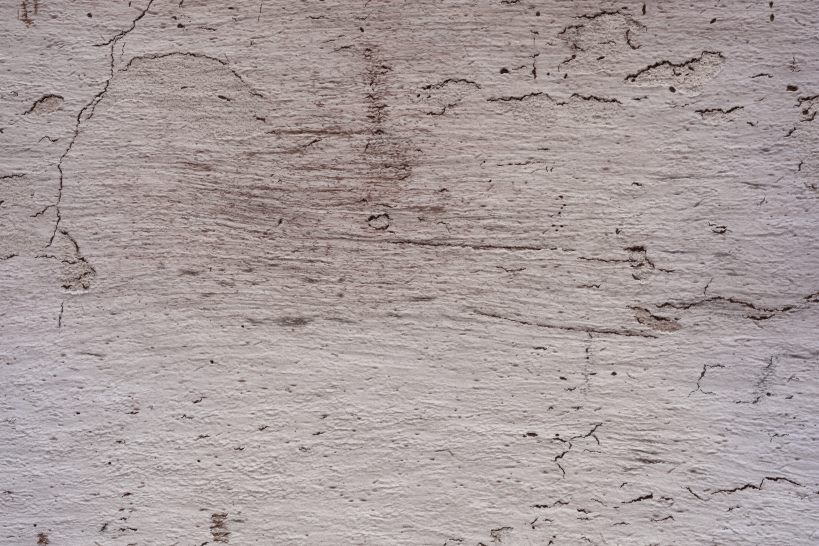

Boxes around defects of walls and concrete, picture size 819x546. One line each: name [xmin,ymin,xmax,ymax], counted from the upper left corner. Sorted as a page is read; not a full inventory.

spalling [22,94,65,118]
crack [30,0,159,248]
spalling [417,79,481,116]
spalling [487,51,758,127]
crack [652,280,819,321]
crack [625,477,819,522]